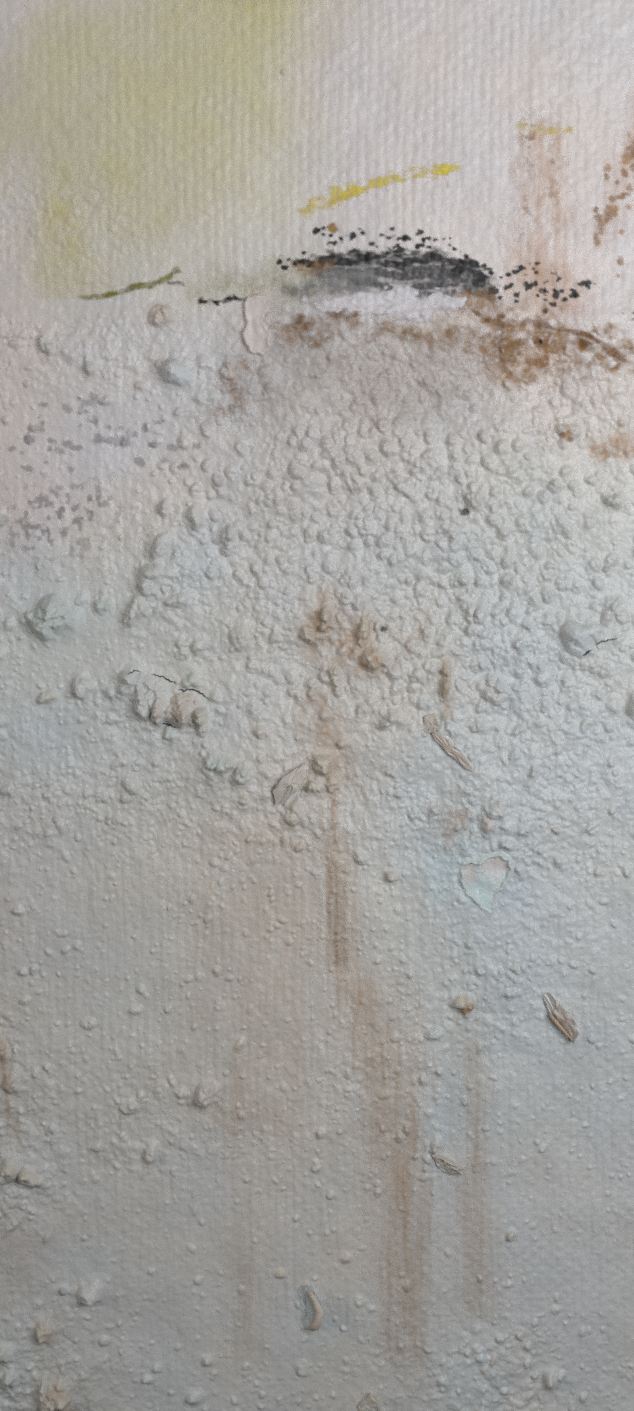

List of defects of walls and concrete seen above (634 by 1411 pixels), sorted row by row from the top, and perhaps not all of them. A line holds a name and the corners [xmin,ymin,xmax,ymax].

corrosion [594,134,634,245]
leakage [297,248,492,287]
peeling [241,293,274,357]
corrosion [462,291,634,381]
peeling [423,714,473,772]